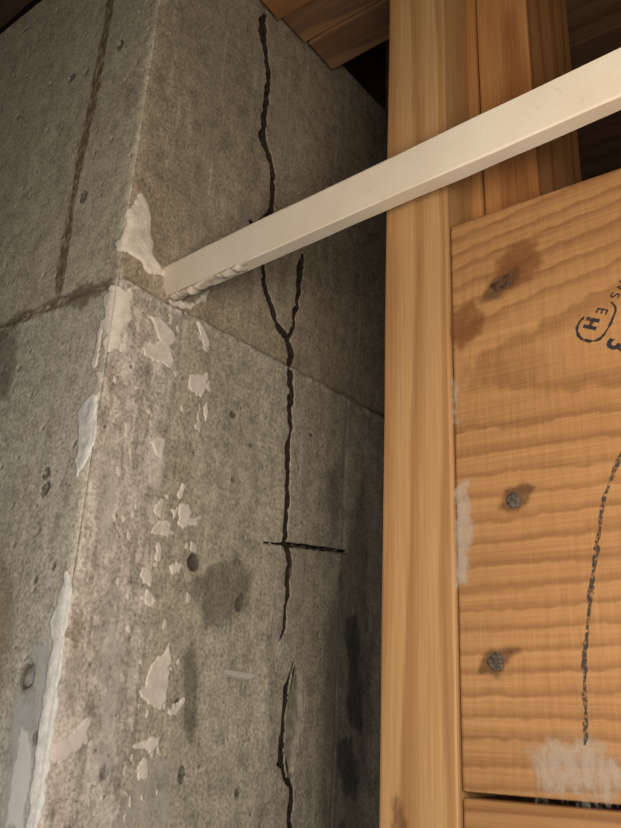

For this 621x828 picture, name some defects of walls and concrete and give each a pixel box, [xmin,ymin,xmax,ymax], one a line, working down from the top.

crack [248,11,276,224]
peeling [90,285,141,390]
peeling [143,299,211,432]
damp [74,393,115,546]
peeling [151,436,165,458]
peeling [140,482,203,607]
crack [261,253,346,649]
damp [5,570,73,828]
crack [276,664,294,828]